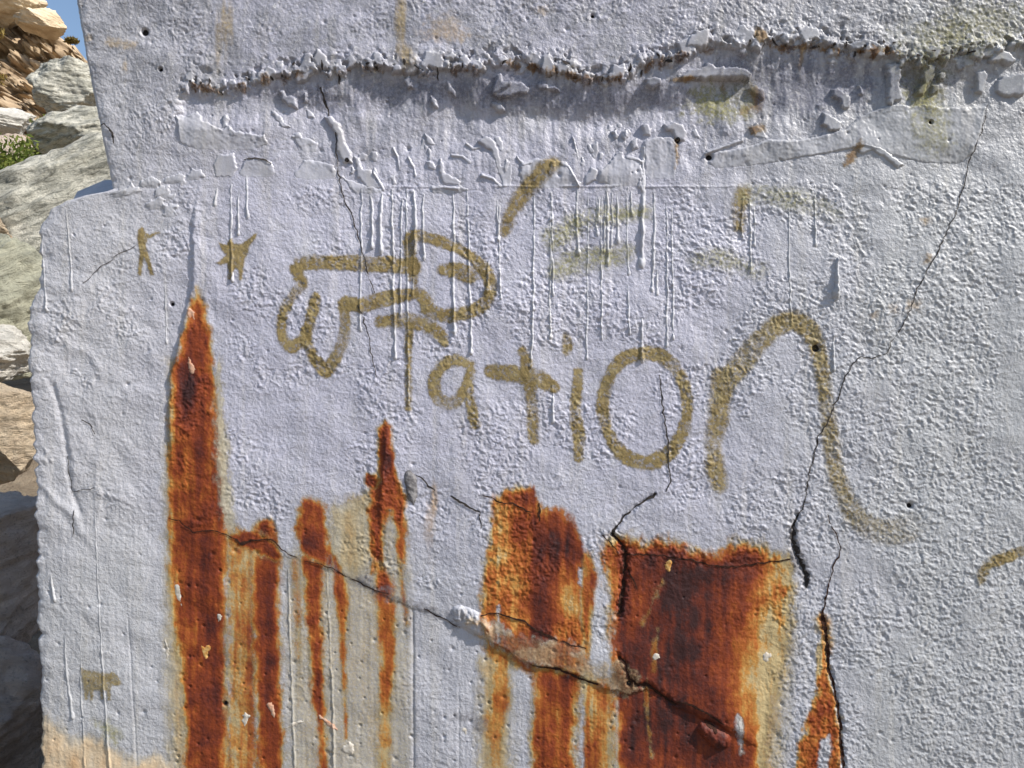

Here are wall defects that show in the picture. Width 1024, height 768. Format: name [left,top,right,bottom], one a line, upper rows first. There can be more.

peeling [111,111,275,217]
peeling [184,24,766,194]
peeling [704,26,1024,169]
corrosion [165,286,349,768]
crack [169,518,389,594]
corrosion [365,420,408,768]
crack [414,474,541,529]
crack [481,613,598,685]
corrosion [478,486,797,768]
crack [602,105,988,768]
corrosion [796,614,841,768]